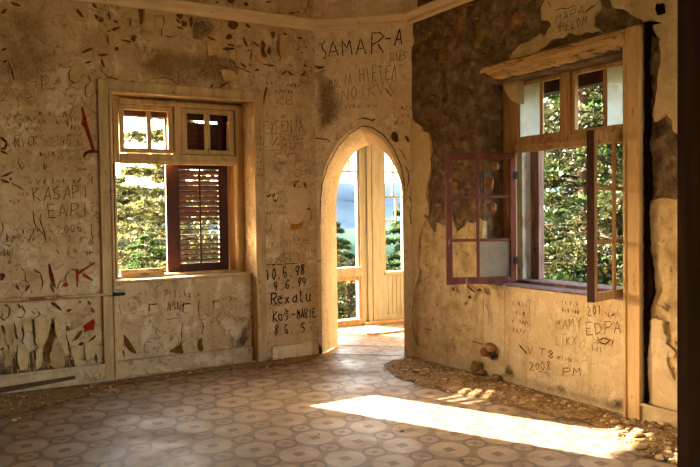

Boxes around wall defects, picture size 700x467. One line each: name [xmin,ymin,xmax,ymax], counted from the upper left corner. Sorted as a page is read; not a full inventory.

peeling [0,299,99,373]
spalling [411,0,551,381]
spalling [540,0,647,52]
spalling [649,36,677,382]